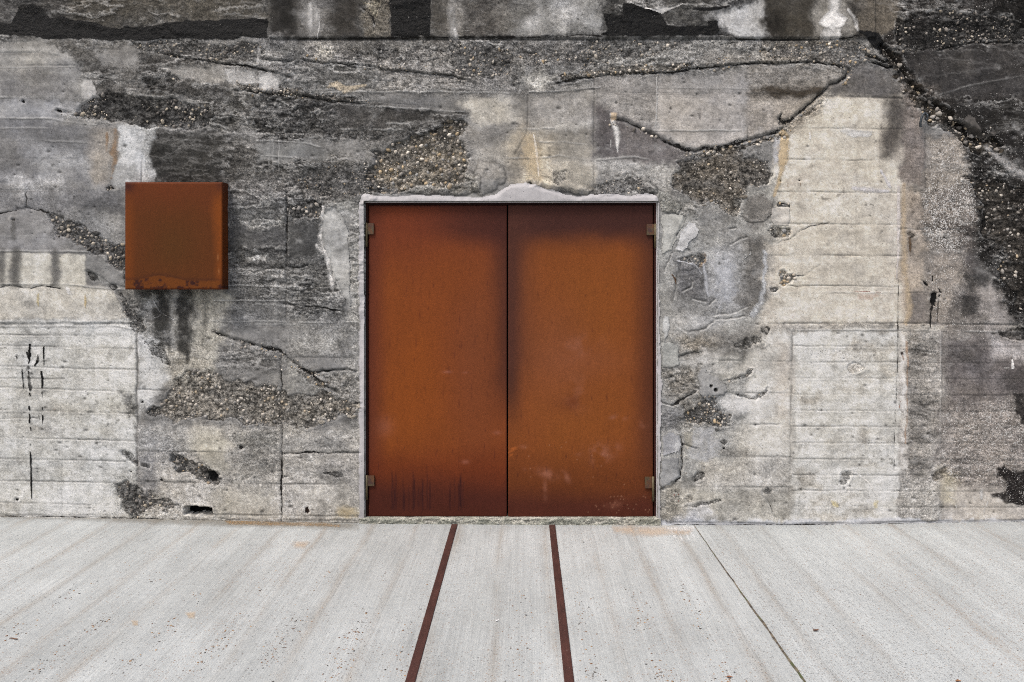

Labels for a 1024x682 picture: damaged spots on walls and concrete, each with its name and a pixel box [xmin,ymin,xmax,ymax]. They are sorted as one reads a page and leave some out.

crack [934,34,1024,51]
crack [558,34,995,162]
spalling [287,119,469,219]
spalling [671,129,786,216]
leakage [985,145,1024,178]
spalling [963,176,1024,311]
leakage [142,290,193,363]
crack [212,330,344,388]
spalling [141,369,365,430]
leakage [1013,393,1024,424]
crack [260,416,341,522]
leakage [980,466,1024,514]